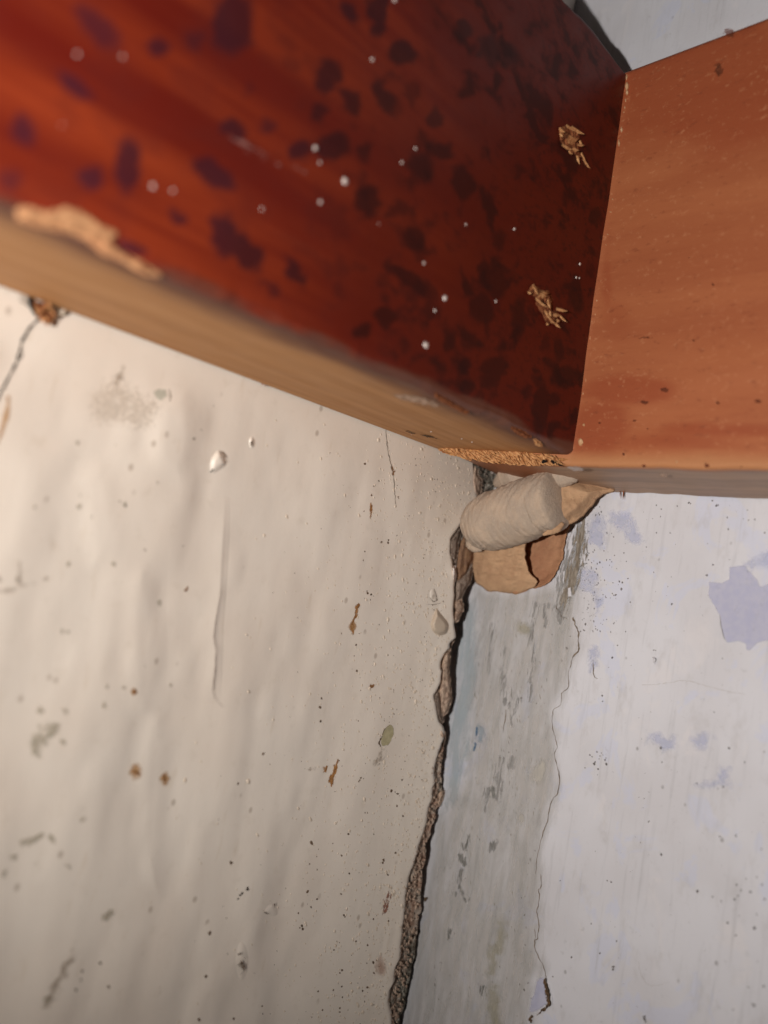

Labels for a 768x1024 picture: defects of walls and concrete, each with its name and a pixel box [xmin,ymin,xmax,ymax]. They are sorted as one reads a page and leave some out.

crack [0,296,40,395]
peeling [709,566,768,650]
crack [534,617,598,977]